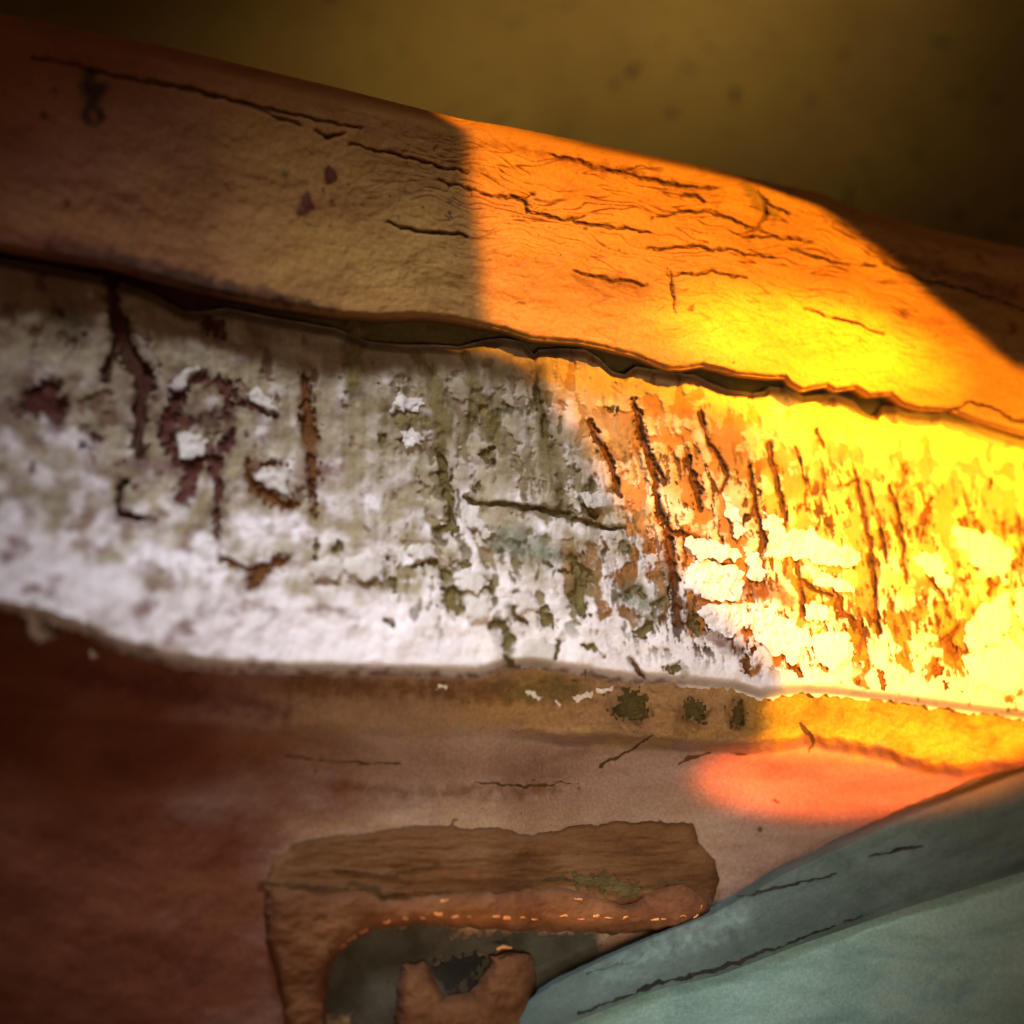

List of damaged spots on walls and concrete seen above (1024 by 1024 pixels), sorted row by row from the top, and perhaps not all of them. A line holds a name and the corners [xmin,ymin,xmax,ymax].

crack [31,57,1024,311]
crack [101,270,157,523]
spalling [156,366,279,540]
crack [803,309,884,336]
peeling [309,538,397,594]
peeling [407,446,561,670]
corrosion [708,631,742,654]
corrosion [742,579,795,605]
peeling [683,492,863,678]
peeling [913,510,1024,694]
crack [577,915,863,1015]
crack [736,872,837,897]